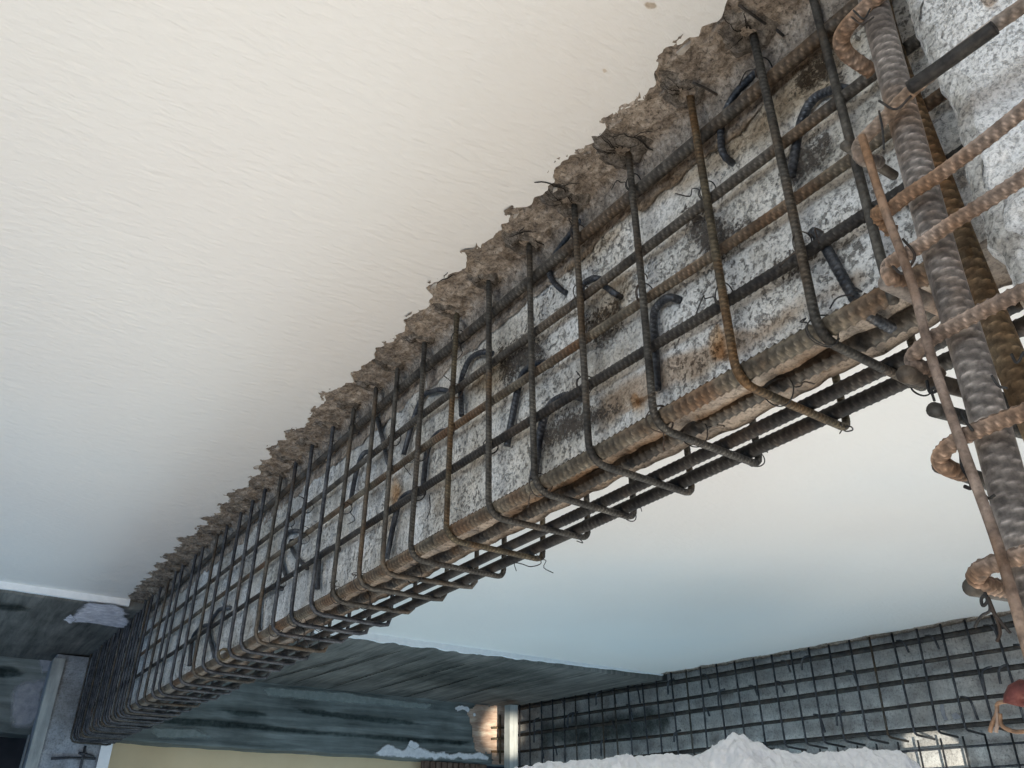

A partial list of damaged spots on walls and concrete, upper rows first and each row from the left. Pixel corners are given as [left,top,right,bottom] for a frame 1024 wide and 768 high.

spalling [909,0,951,62]
spalling [788,49,832,101]
spalling [938,66,979,147]
spalling [773,123,832,192]
spalling [965,154,989,201]
spalling [673,203,758,263]
spalling [982,200,1024,286]
spalling [585,289,631,354]
spalling [495,325,549,386]
spalling [541,398,622,452]
peeling [64,603,128,628]
spalling [376,704,505,765]